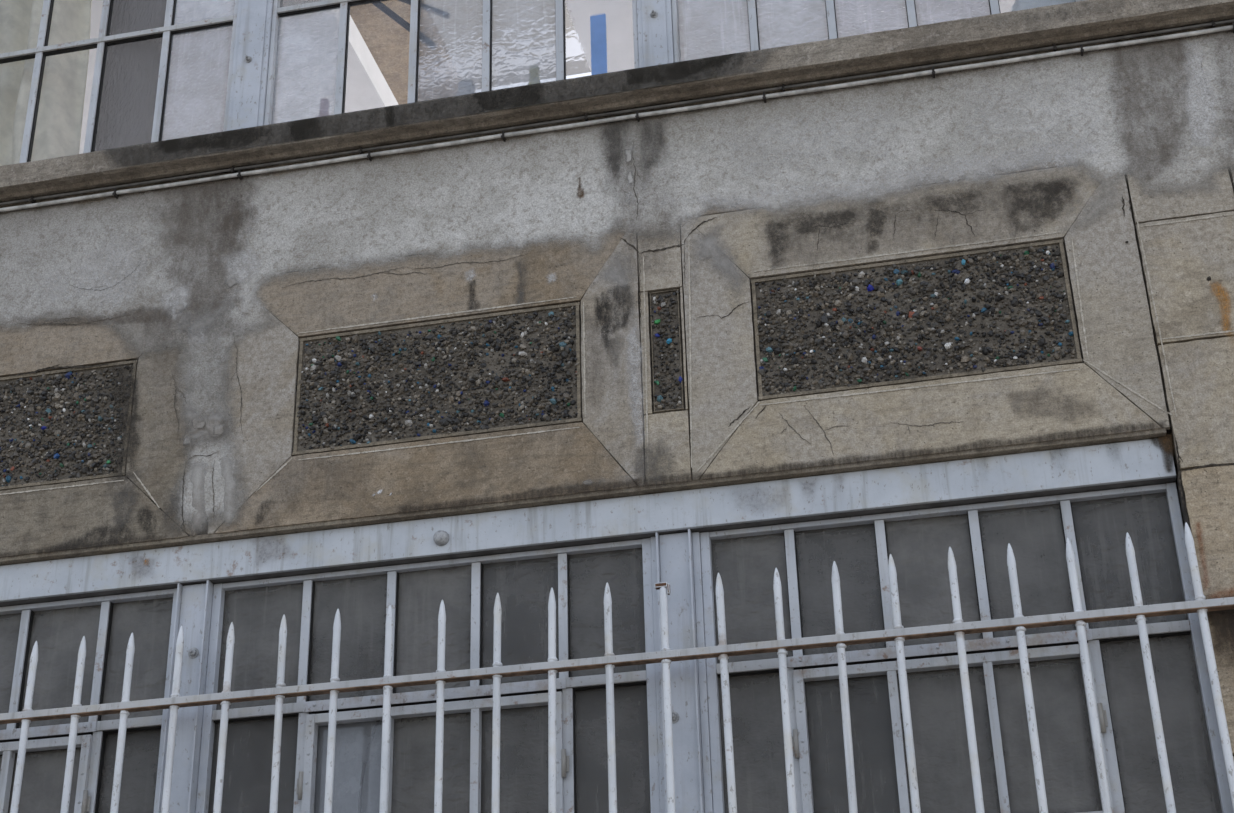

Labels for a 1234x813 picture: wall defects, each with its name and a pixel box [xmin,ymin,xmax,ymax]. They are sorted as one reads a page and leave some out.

water stain [173,172,248,323]
water stain [597,288,631,346]
crack [728,406,838,455]